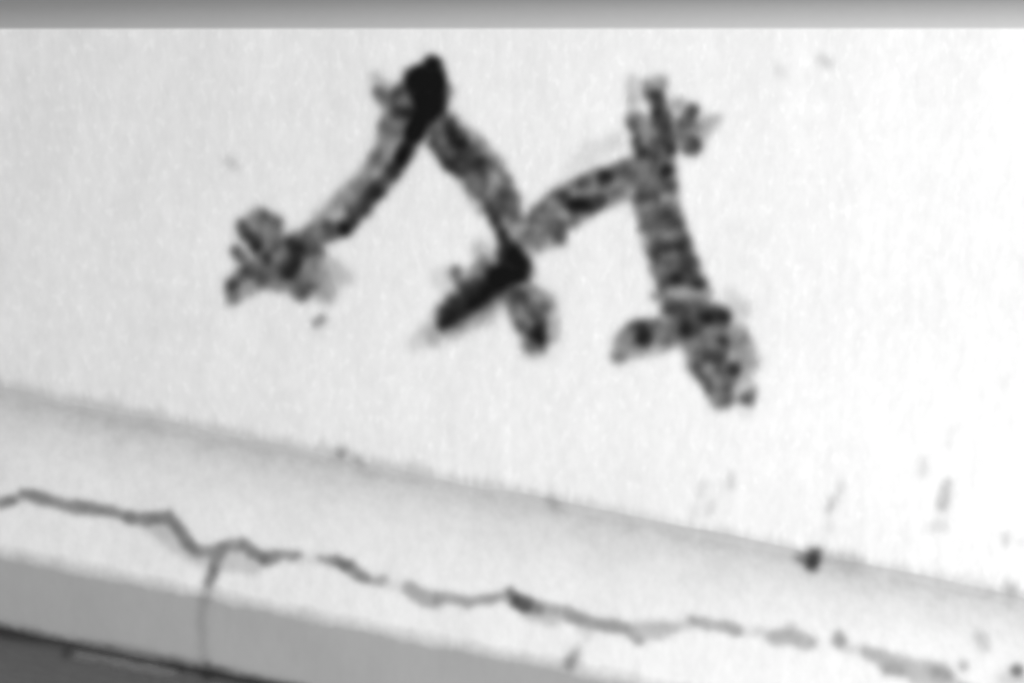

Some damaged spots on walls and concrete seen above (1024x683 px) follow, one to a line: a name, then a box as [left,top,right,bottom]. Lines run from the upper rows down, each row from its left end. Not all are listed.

crack [151,518,194,550]
crack [259,554,269,562]
crack [339,561,351,569]
crack [509,593,536,612]